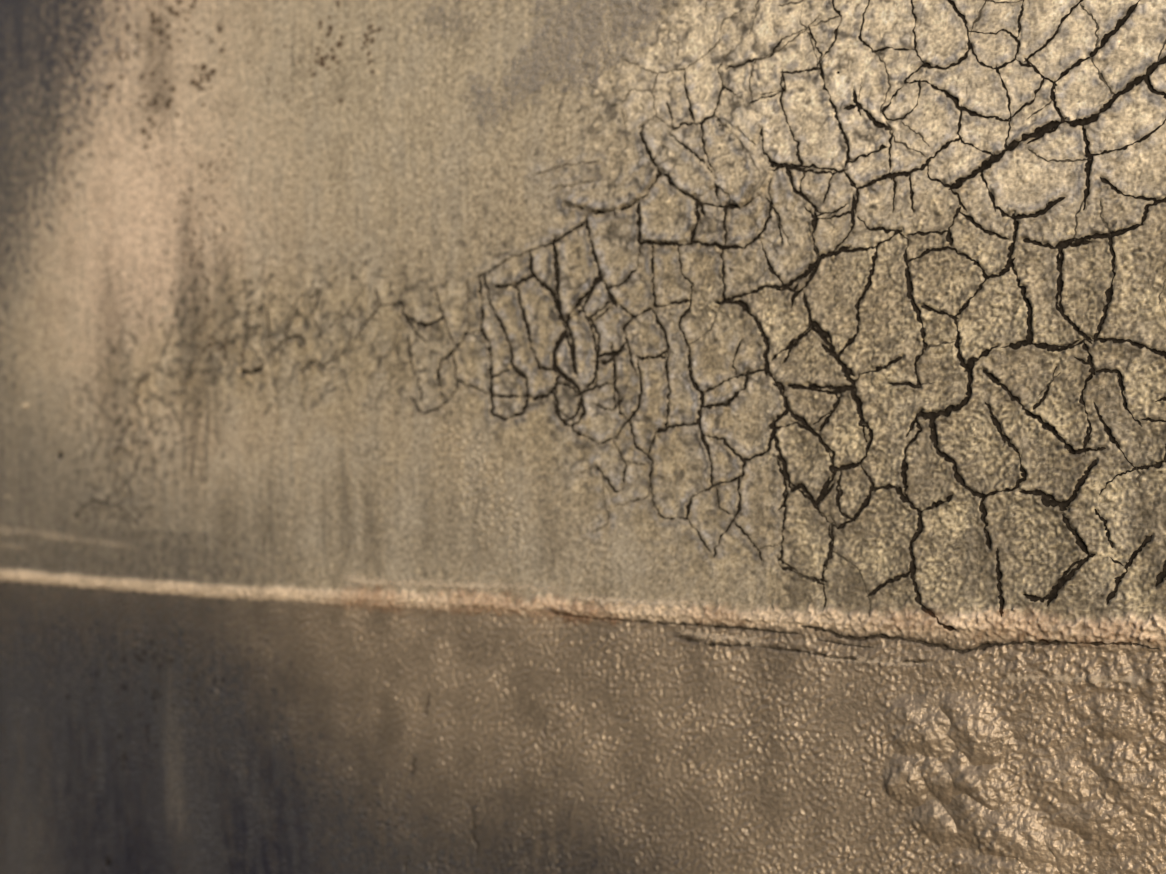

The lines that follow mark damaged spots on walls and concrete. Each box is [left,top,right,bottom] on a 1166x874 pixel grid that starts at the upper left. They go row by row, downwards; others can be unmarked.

damp [0,0,130,312]
crack [77,0,1166,664]
damp [0,581,606,874]